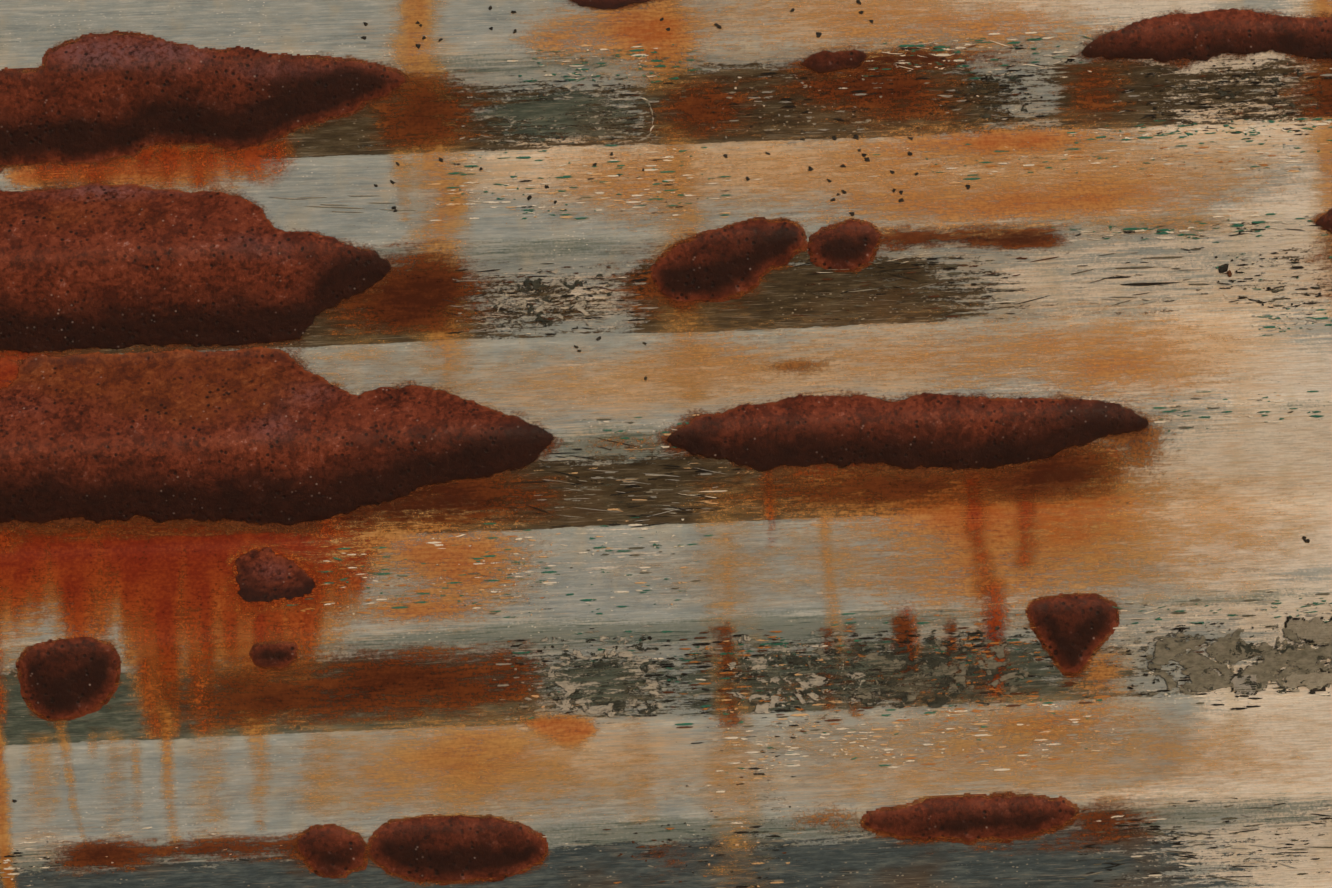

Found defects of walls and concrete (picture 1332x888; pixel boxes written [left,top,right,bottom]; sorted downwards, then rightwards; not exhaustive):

corrosion [511,0,1332,748]
corrosion [686,554,767,805]
corrosion [794,791,1155,852]